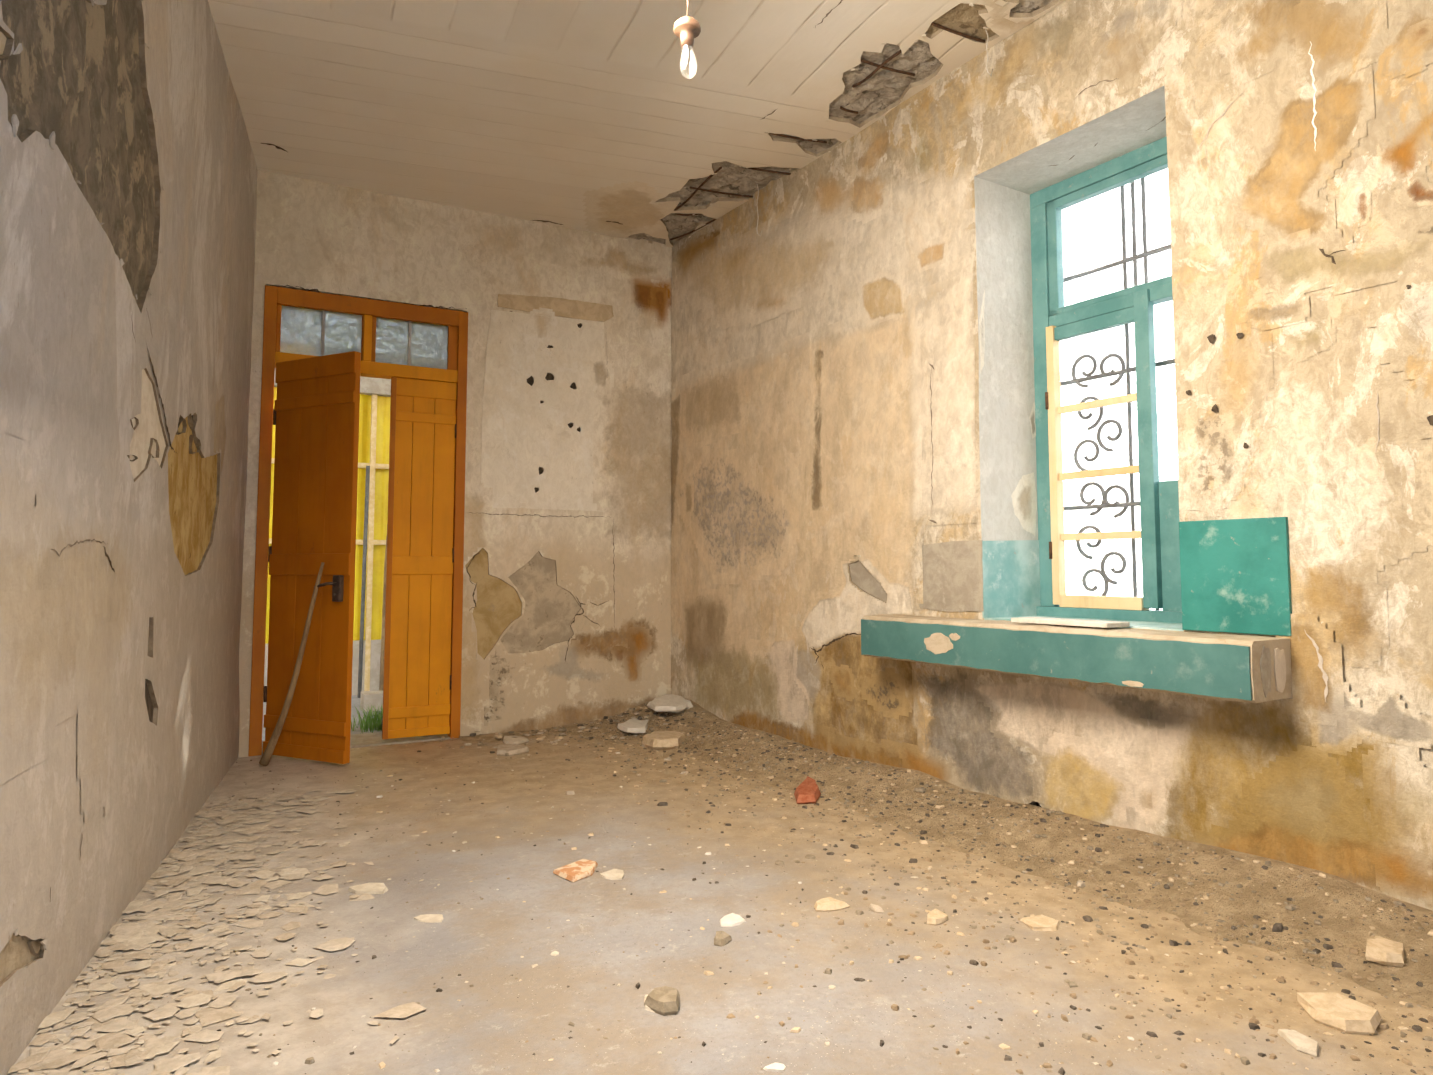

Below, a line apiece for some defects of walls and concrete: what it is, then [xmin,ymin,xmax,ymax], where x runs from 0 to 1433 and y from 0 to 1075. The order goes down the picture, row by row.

spalling [826,0,996,124]
spalling [1010,0,1053,13]
flaking render [0,0,164,305]
spalling [623,161,795,244]
spalling [764,132,839,154]
water stain [572,0,1160,331]
water stain [1182,0,1433,517]
flaking render [129,369,217,575]
flaking render [465,548,581,659]
flaking render [849,561,887,602]
water stain [861,503,1433,855]